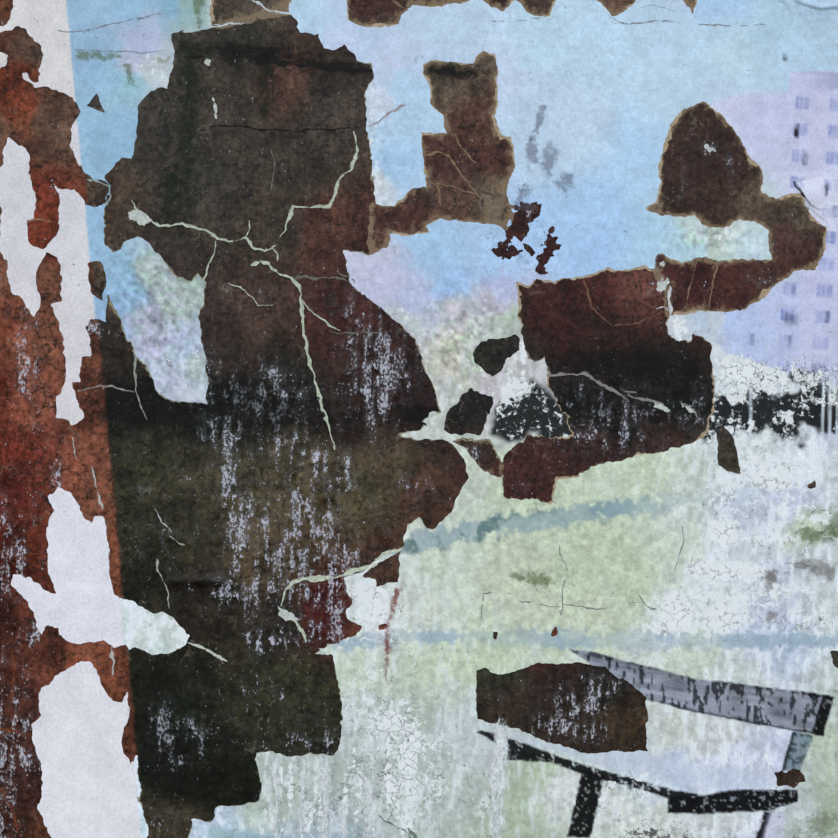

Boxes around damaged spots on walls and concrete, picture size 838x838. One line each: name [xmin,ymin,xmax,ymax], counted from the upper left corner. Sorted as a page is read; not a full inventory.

peeling [483,0,556,17]
peeling [597,0,636,16]
crack [267,59,373,74]
crack [87,179,111,207]
crack [131,104,407,450]
peeling [455,101,827,505]
crack [78,353,147,419]
peeling [0,0,542,838]
peeling [476,662,648,754]